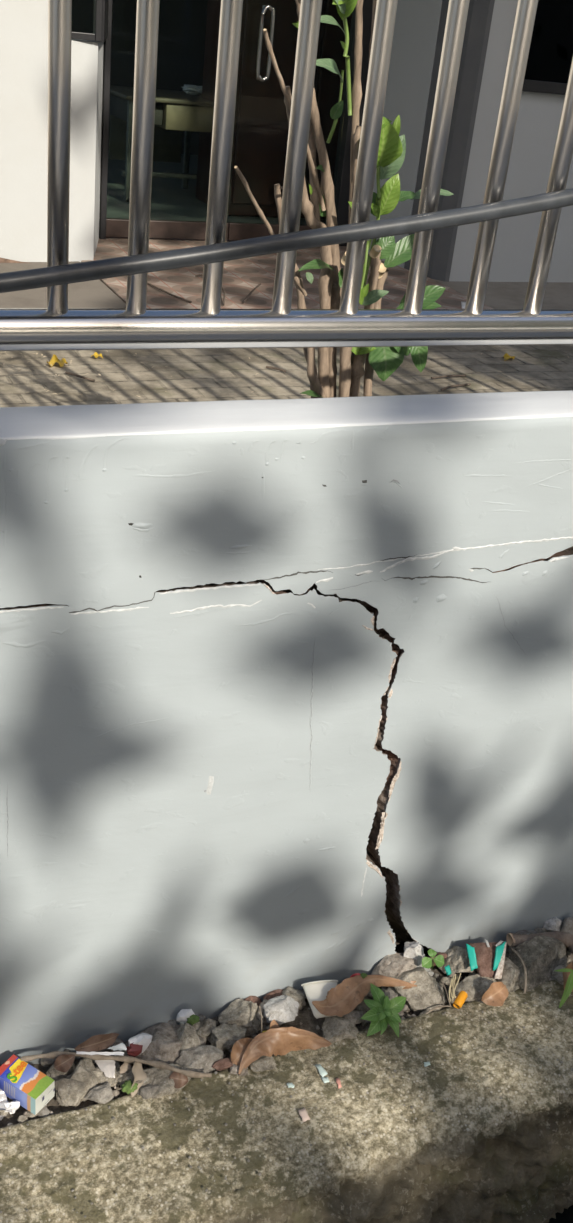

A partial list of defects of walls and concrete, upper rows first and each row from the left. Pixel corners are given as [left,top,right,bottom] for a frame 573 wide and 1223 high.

crack [0,546,573,953]